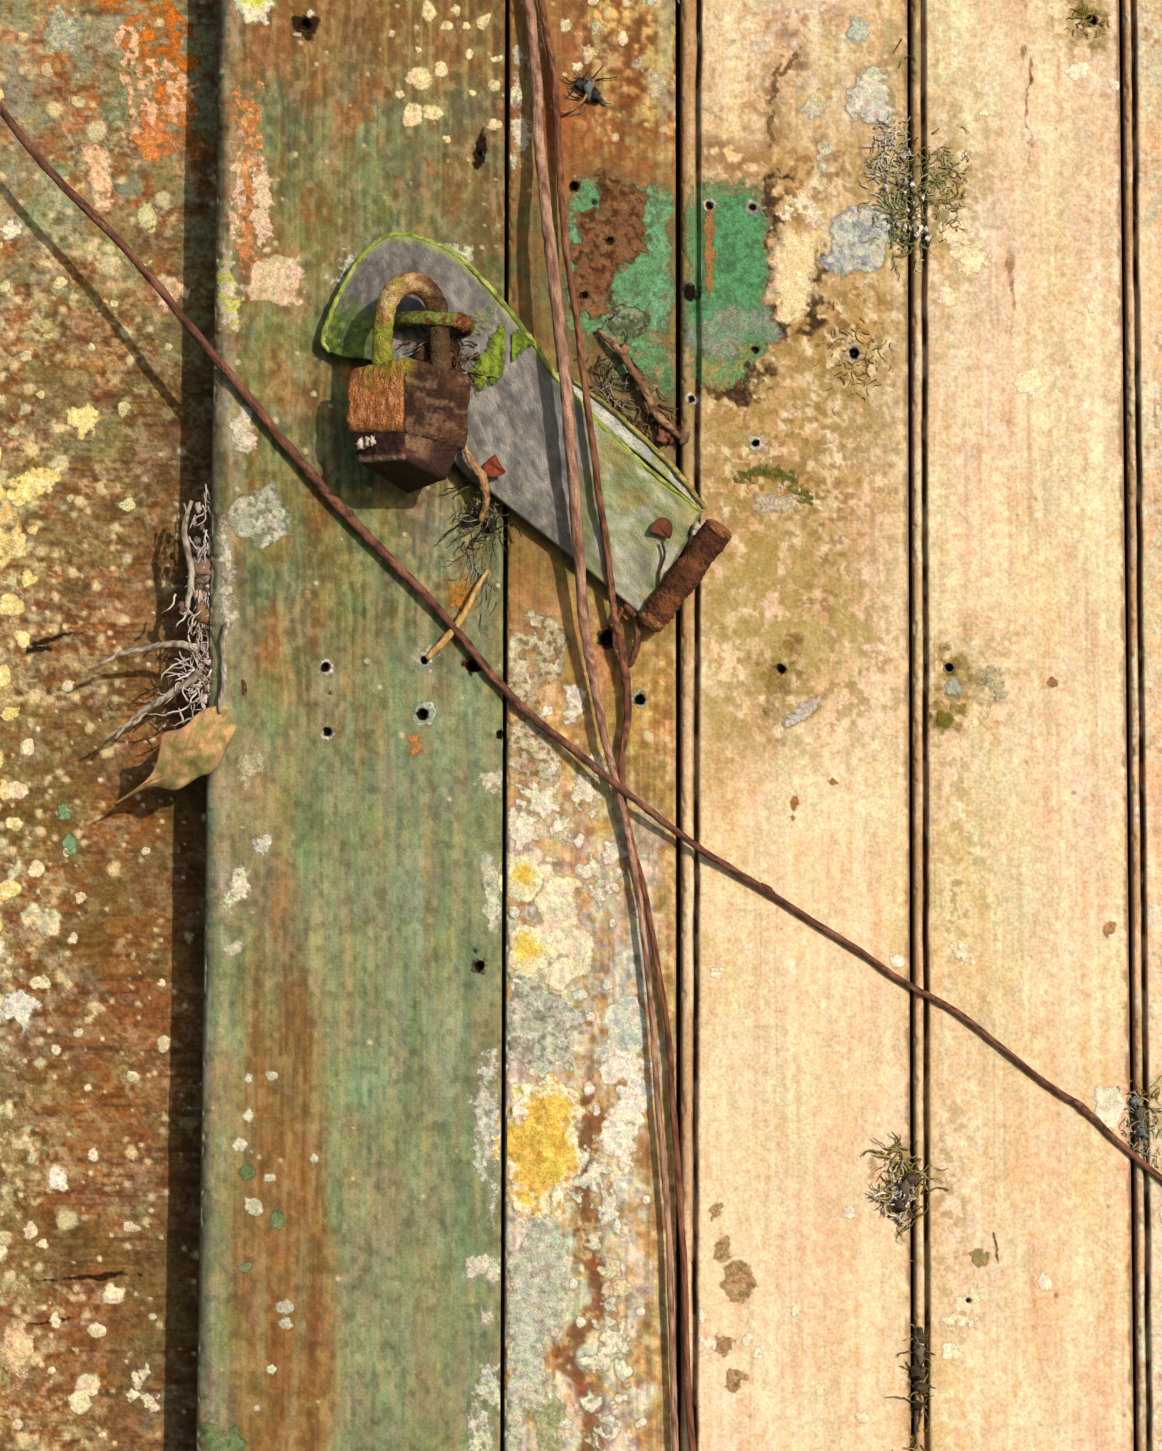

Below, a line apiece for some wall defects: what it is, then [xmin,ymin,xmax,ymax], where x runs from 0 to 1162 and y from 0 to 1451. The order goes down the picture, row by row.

peeling [563,167,783,403]